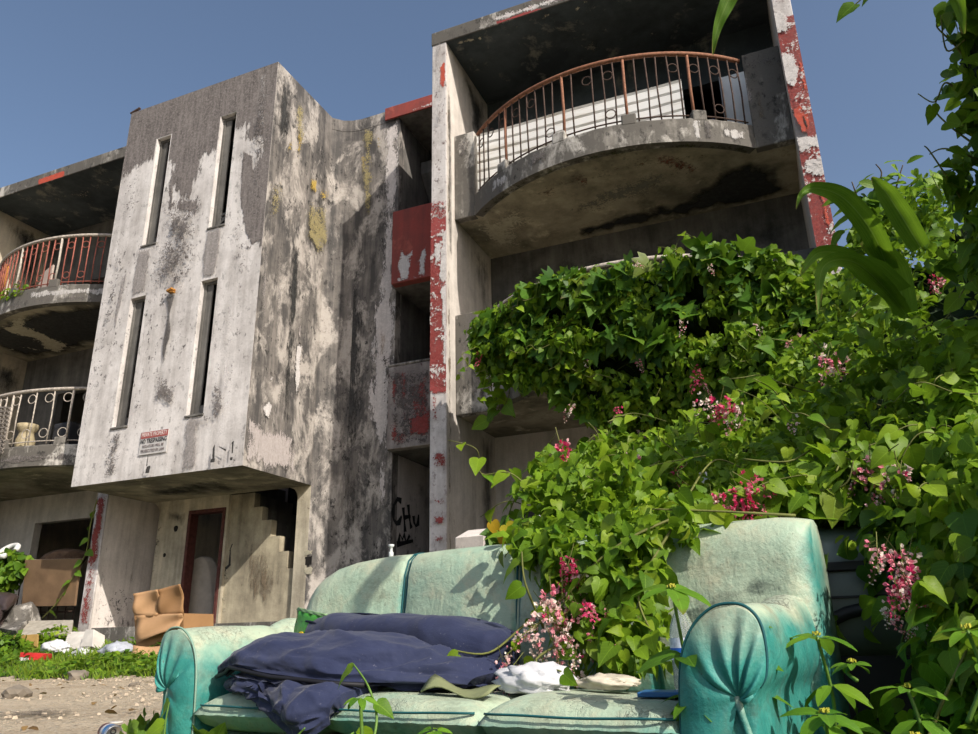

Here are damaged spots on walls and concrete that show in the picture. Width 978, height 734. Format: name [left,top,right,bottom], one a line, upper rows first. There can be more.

leakage [280,87,290,133]
peeling [773,2,838,247]
leakage [155,378,175,403]
leakage [278,247,301,420]
leakage [347,273,366,443]
peeling [389,201,446,444]
peeling [78,551,97,624]